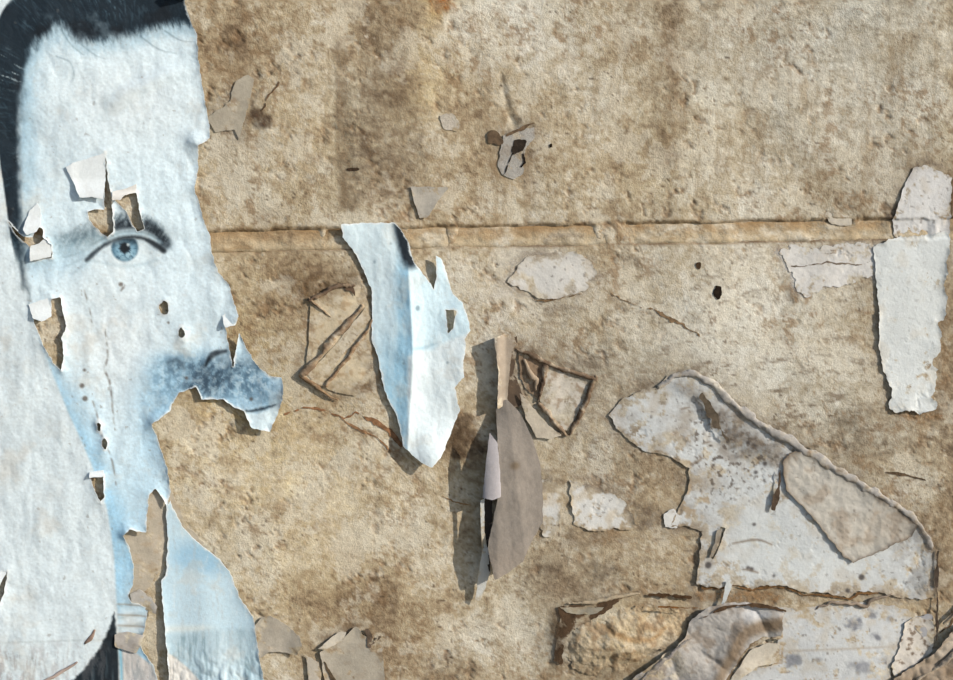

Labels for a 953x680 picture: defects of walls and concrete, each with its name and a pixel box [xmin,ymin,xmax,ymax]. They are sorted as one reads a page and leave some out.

peeling [507,251,597,302]
peeling [778,162,953,415]
peeling [540,369,939,680]